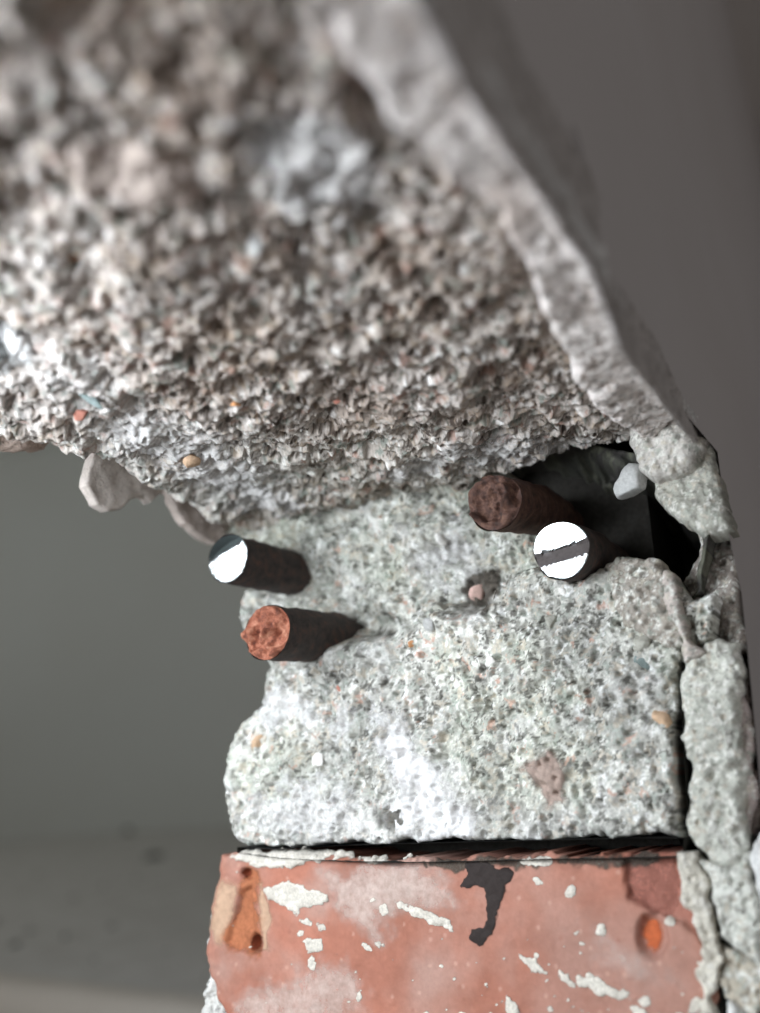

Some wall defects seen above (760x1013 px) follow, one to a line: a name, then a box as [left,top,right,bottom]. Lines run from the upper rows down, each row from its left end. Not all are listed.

spalling [511,445,639,495]
peeling [79,453,229,545]
spalling [641,479,717,599]
spalling [461,569,501,616]
crack [237,709,710,863]
rust [210,867,271,955]
spalling [626,858,680,915]
crack [719,936,733,949]
crack [719,985,730,1013]